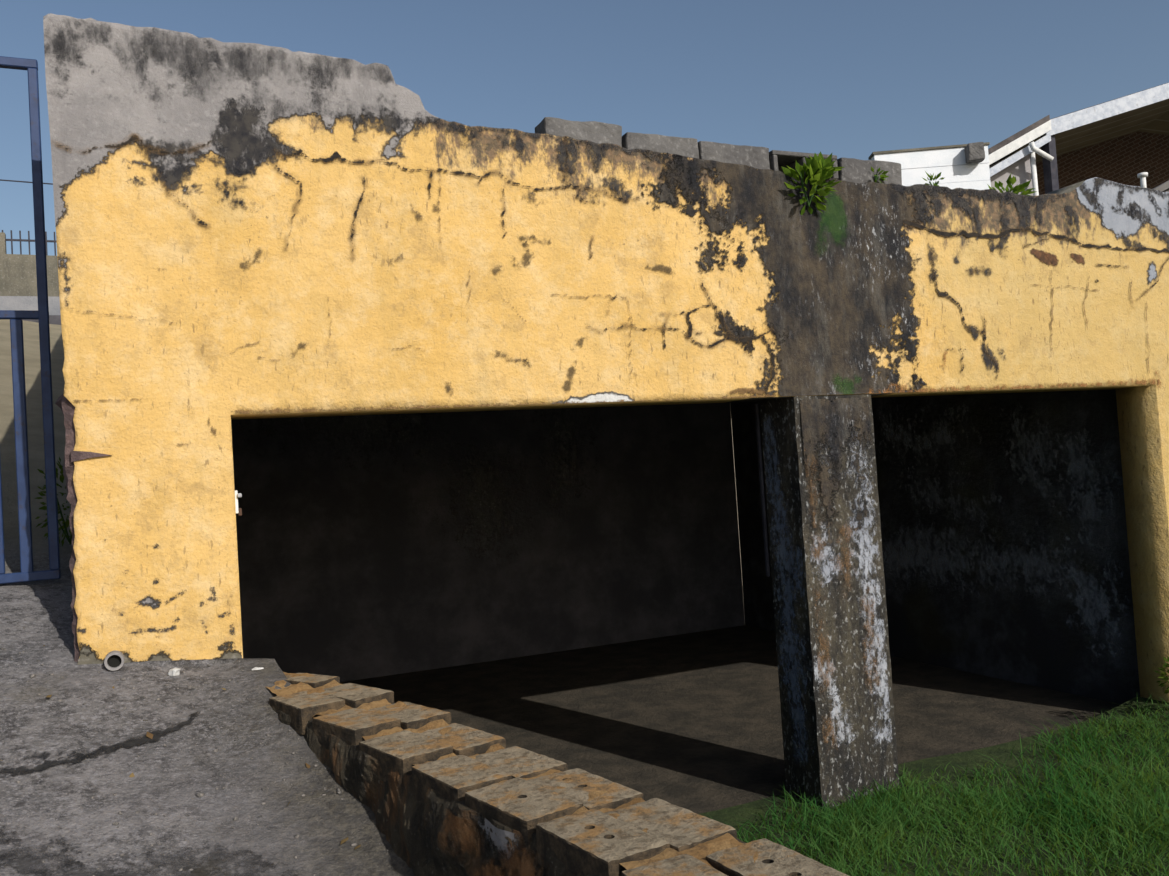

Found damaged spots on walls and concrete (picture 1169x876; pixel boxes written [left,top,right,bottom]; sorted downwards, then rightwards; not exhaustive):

water stain [54,27,110,58]
water stain [131,29,273,89]
water stain [139,96,301,208]
flaking render [43,13,440,226]
crack [275,136,639,251]
flaking render [1075,177,1169,240]
crack [552,283,776,393]
water stain [337,108,1169,561]
crack [903,220,1169,378]
spalling [552,391,634,404]
flaking render [136,579,186,609]
crack [0,711,200,775]